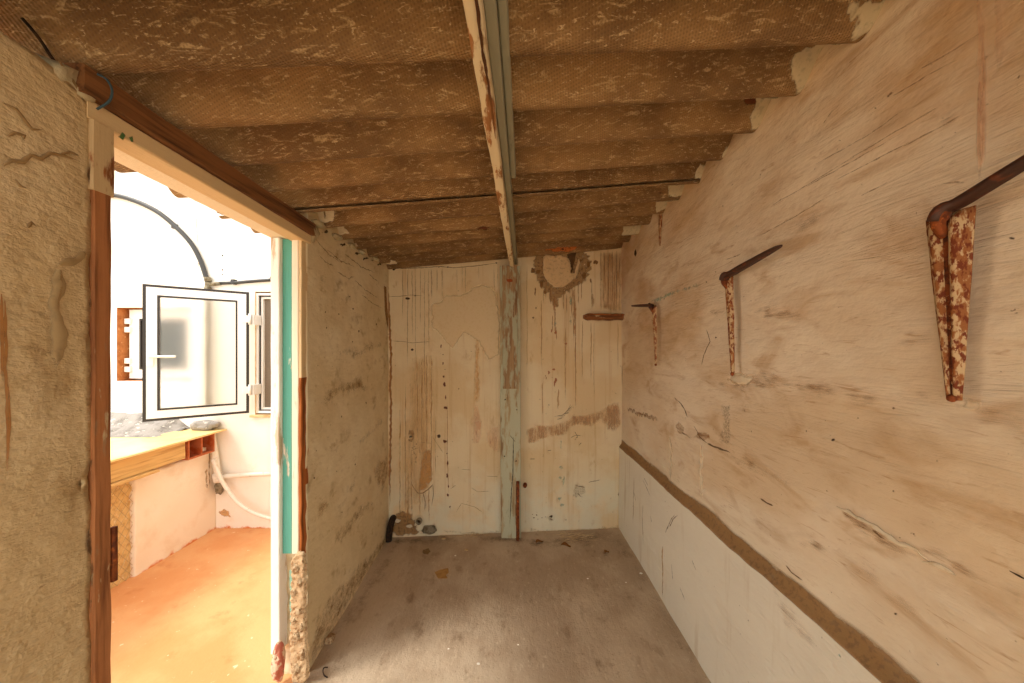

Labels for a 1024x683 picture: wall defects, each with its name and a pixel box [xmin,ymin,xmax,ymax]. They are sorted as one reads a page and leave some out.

crack [2,102,78,188]
spalling [531,252,598,307]
damp [529,405,654,442]
damp [377,451,436,514]
spalling [393,511,423,536]
spalling [289,551,310,683]